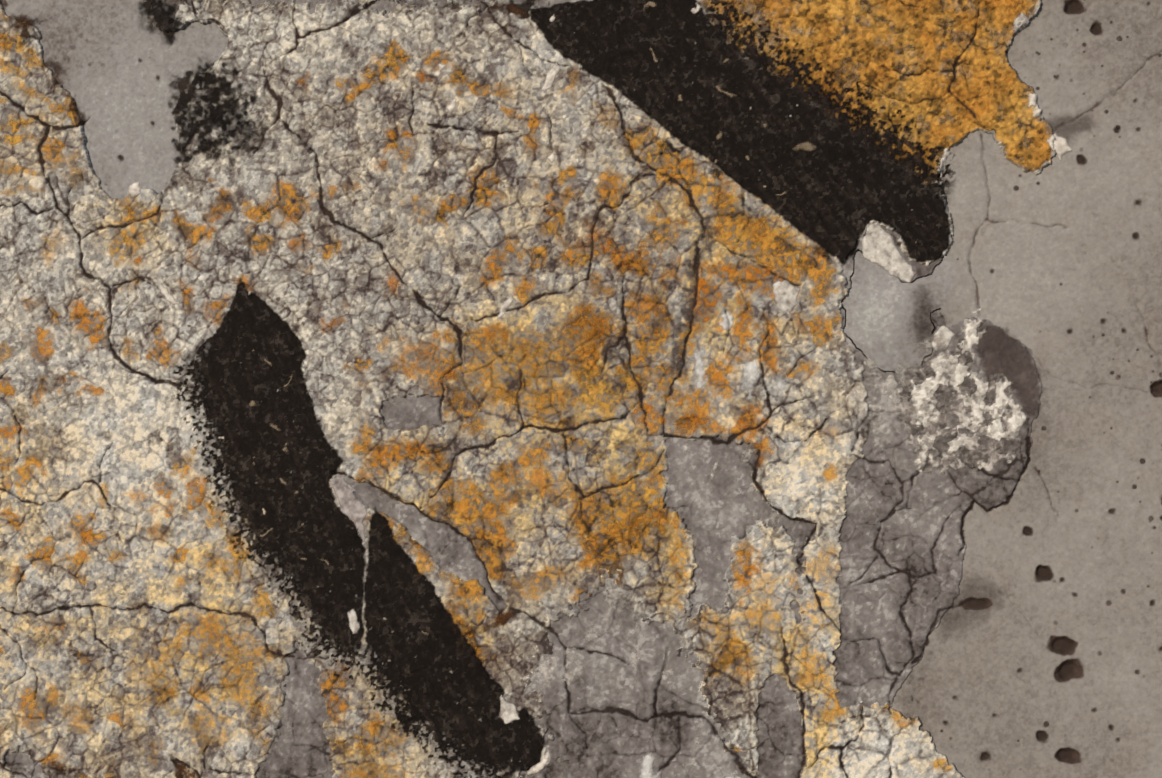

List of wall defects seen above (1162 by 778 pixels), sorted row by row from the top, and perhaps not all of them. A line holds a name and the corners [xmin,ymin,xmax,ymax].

peeling [2,0,228,200]
crack [288,0,377,53]
peeling [222,0,593,21]
crack [863,2,1002,118]
peeling [1047,134,1072,160]
crack [0,91,193,388]
peeling [862,222,915,282]
crack [0,447,111,507]
crack [254,69,1031,778]
peeling [833,317,1042,708]
crack [1,570,329,699]
peeling [500,435,816,778]